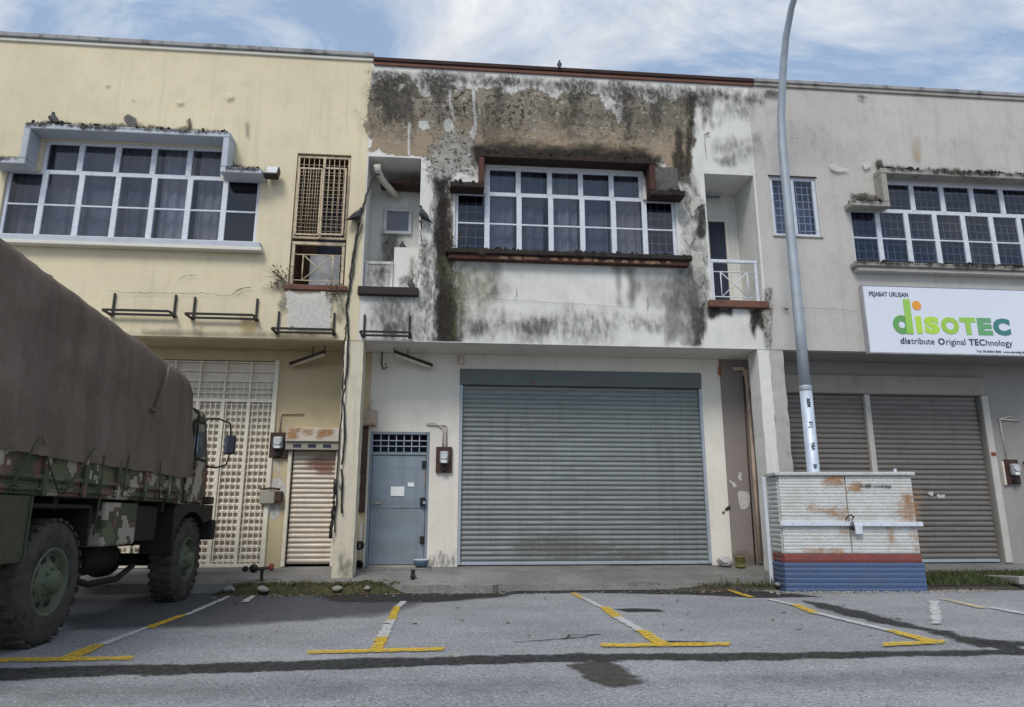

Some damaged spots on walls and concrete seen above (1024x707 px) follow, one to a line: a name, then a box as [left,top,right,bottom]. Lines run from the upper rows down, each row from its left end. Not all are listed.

peeling [363,74,706,307]
damp [370,70,778,345]
crack [108,275,252,296]
rust [288,428,334,439]
peeling [730,472,750,510]
rust [824,476,891,490]